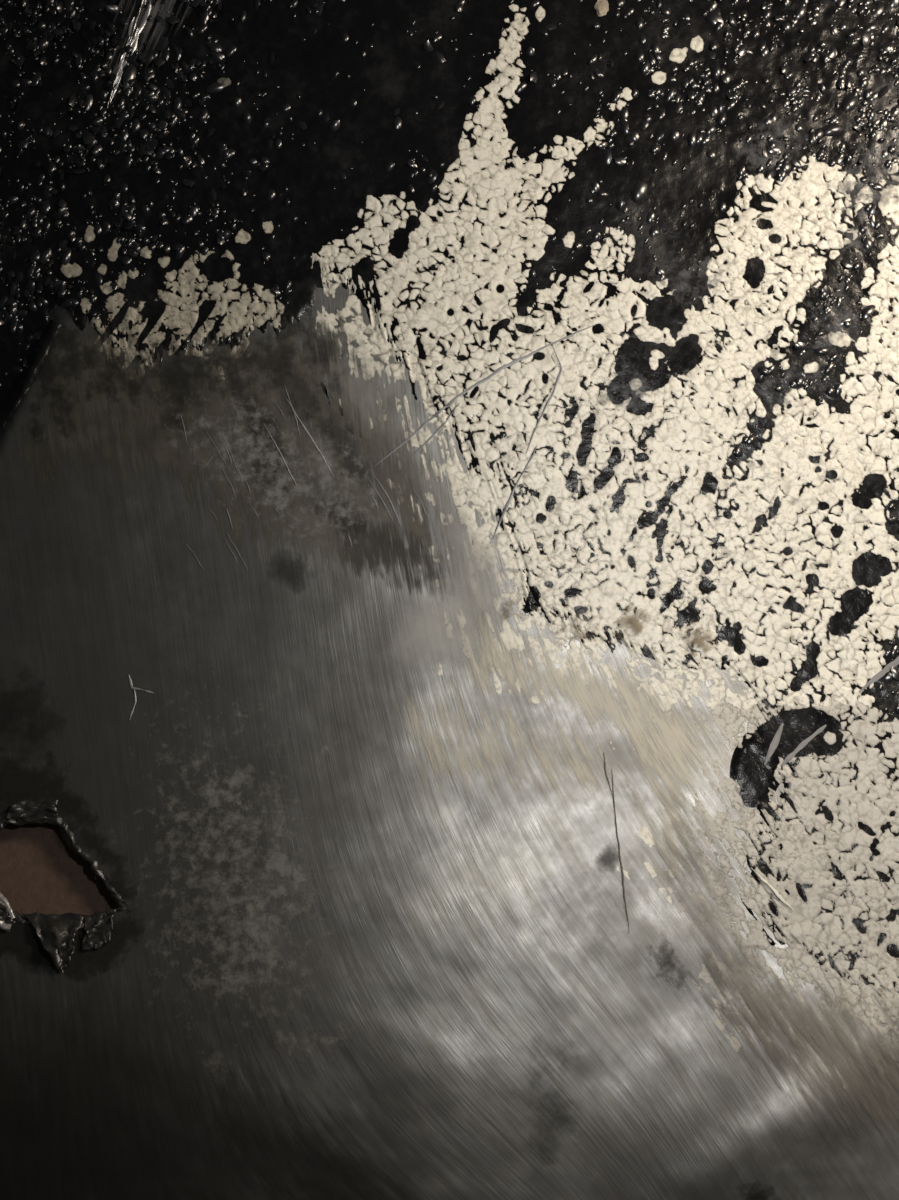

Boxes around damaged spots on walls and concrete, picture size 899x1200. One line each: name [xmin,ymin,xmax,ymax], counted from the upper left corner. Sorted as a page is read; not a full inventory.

damp [151,766,331,996]